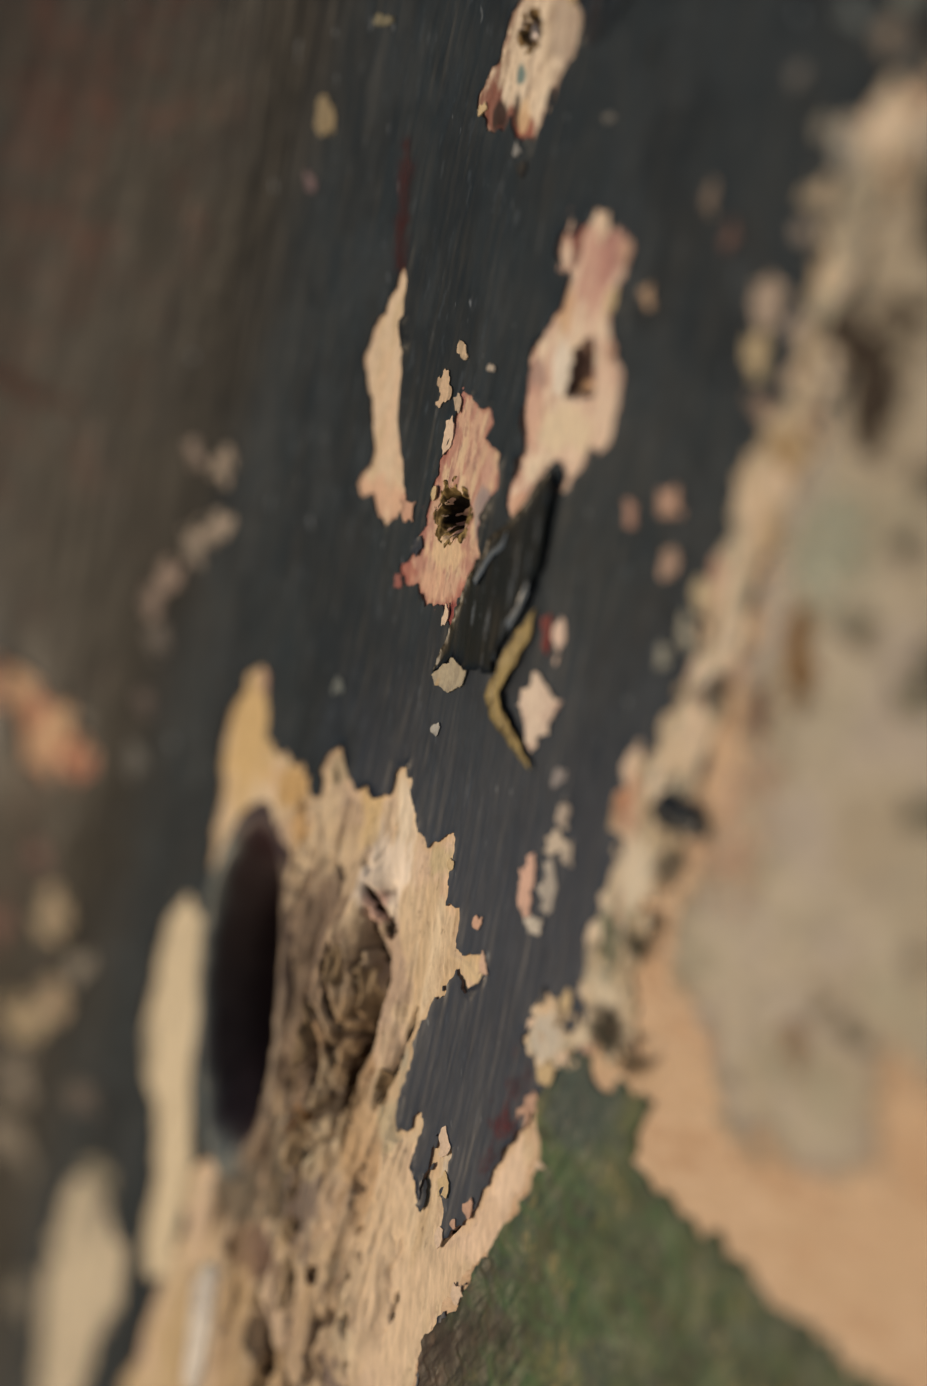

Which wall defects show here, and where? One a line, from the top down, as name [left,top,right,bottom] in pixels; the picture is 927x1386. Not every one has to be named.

peeling [315,95,336,138]
peeling [478,0,634,157]
peeling [139,509,236,621]
peeling [358,207,633,693]
peeling [517,76,922,1087]
spalling [121,665,545,1386]
peeling [31,1153,126,1386]